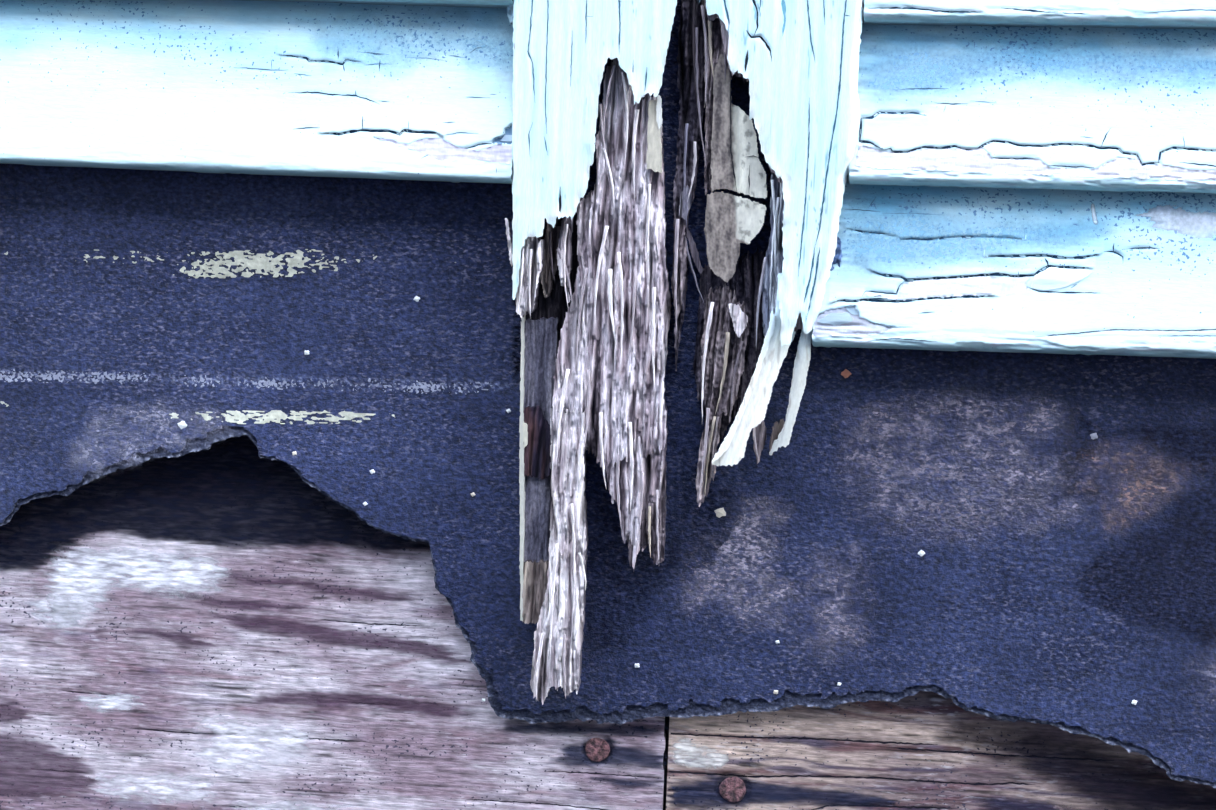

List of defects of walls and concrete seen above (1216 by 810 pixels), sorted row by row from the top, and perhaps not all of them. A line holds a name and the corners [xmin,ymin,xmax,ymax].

crack [233,45,497,172]
crack [527,0,621,155]
peeling [646,95,663,173]
crack [723,0,1216,342]
damp [846,400,1104,531]
damp [1079,427,1216,641]
damp [133,630,212,646]
damp [150,590,469,663]
damp [223,572,409,601]
damp [815,576,859,643]
damp [0,701,96,797]
damp [258,692,466,716]